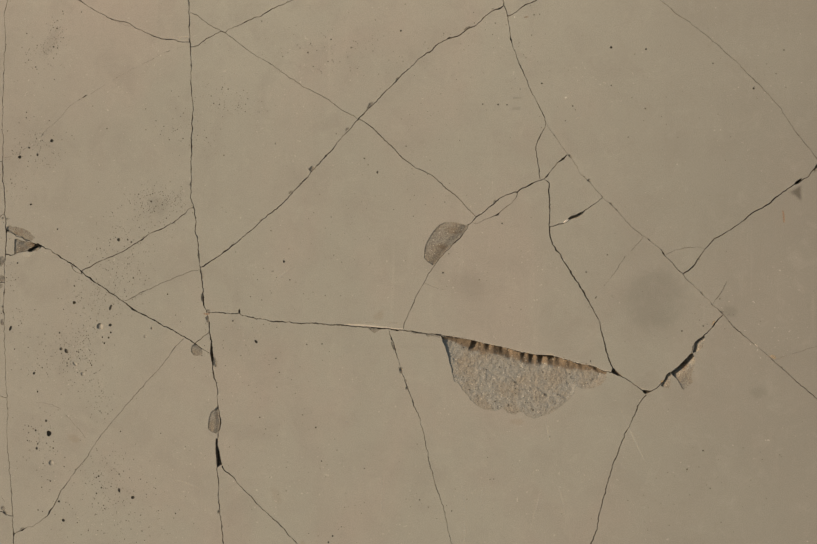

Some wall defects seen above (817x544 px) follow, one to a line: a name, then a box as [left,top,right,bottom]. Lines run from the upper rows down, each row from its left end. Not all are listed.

crack [79,0,180,42]
crack [188,0,292,73]
crack [663,2,784,114]
spalling [7,226,41,254]
crack [0,81,463,544]
spalling [424,222,467,265]
crack [297,0,688,544]
crack [658,125,817,350]
spalling [412,332,607,419]
spalling [661,336,705,390]